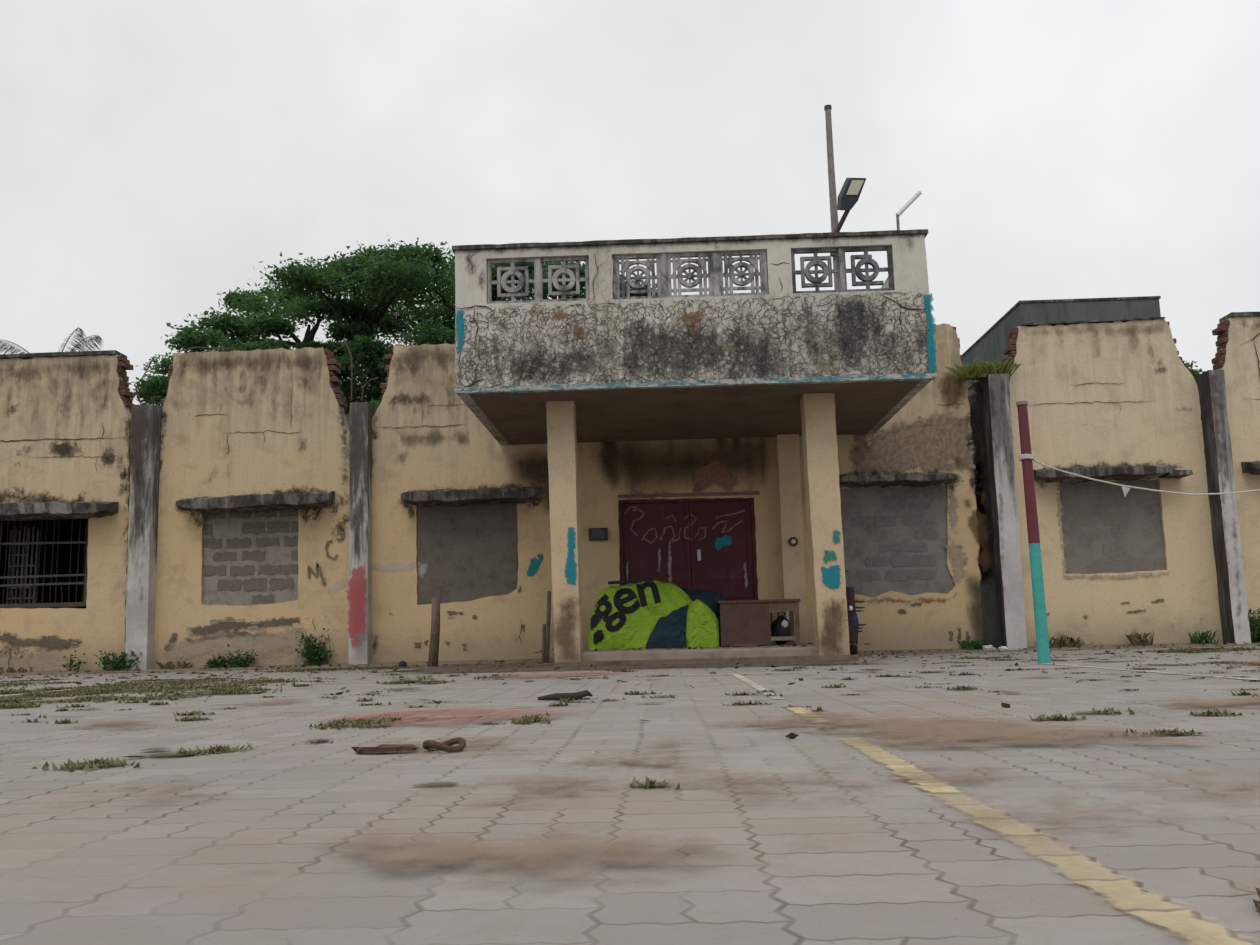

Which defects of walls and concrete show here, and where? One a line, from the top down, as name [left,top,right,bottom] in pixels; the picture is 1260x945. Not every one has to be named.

spalling [117,356,135,413]
spalling [324,348,347,407]
water stain [513,340,593,379]
crack [374,253,928,434]
water stain [626,321,777,379]
water stain [836,301,906,367]
crack [1238,332,1260,400]
water stain [52,443,77,457]
water stain [102,422,131,504]
peeling [850,413,976,475]
mould [0,492,84,502]
spalling [946,494,990,581]